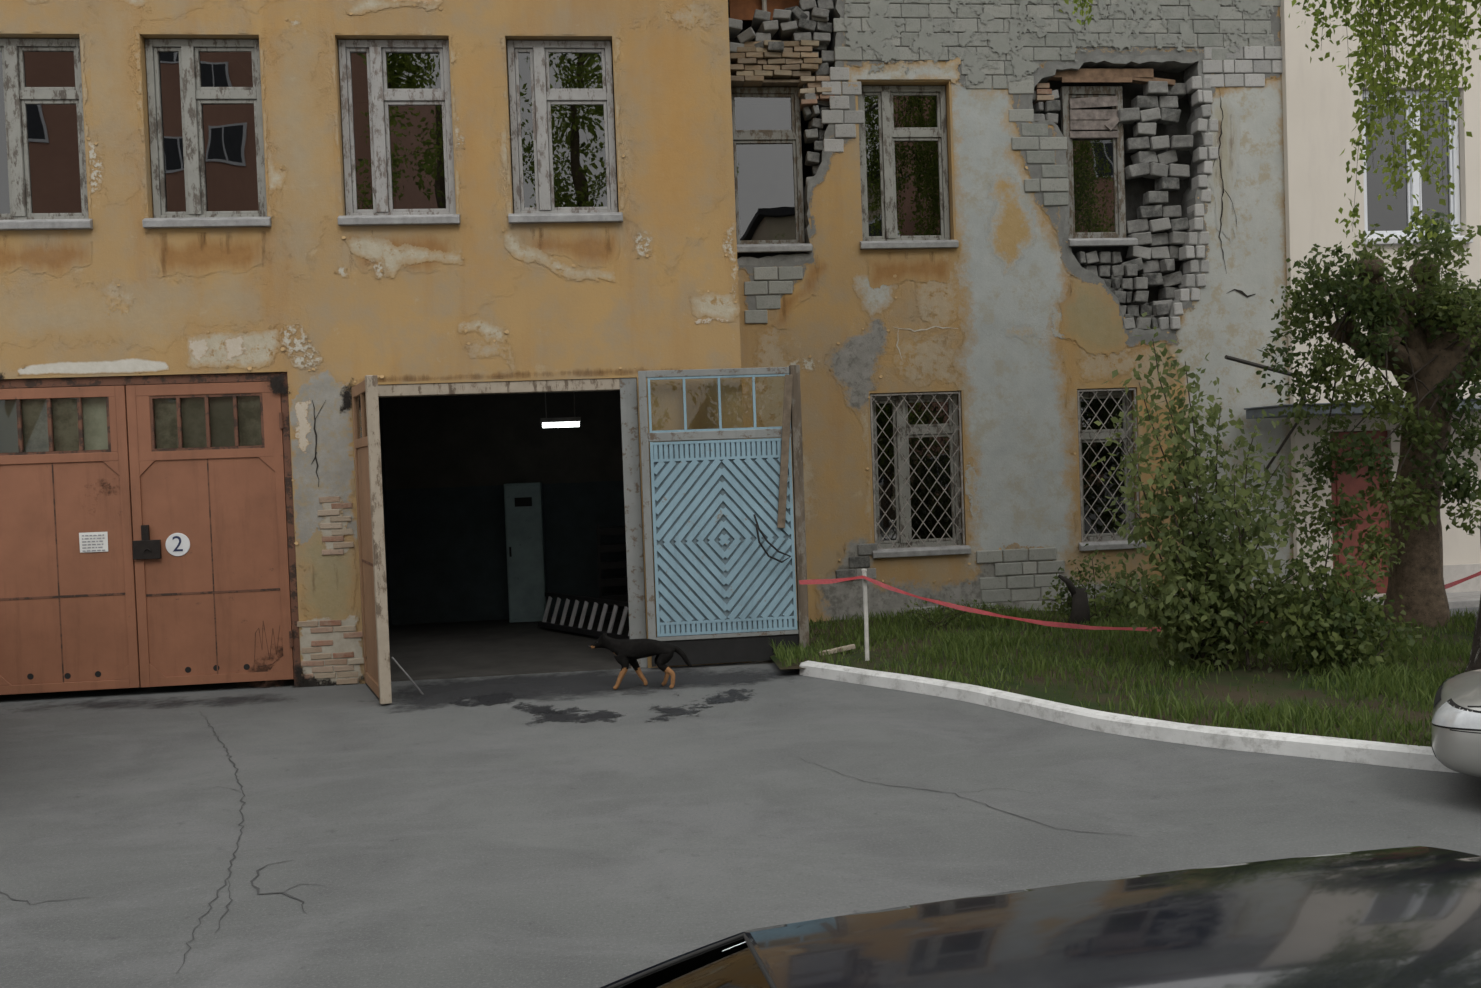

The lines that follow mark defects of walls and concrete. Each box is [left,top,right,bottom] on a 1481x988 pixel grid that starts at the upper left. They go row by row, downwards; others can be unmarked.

leakage [78,0,337,287]
peeling [347,0,443,16]
peeling [330,31,466,279]
peeling [499,33,616,283]
peeling [599,30,625,212]
spalling [666,0,852,308]
leakage [0,268,269,356]
spalling [17,323,358,555]
crack [312,400,325,487]
peeling [786,47,1294,600]
flaking render [297,615,364,685]